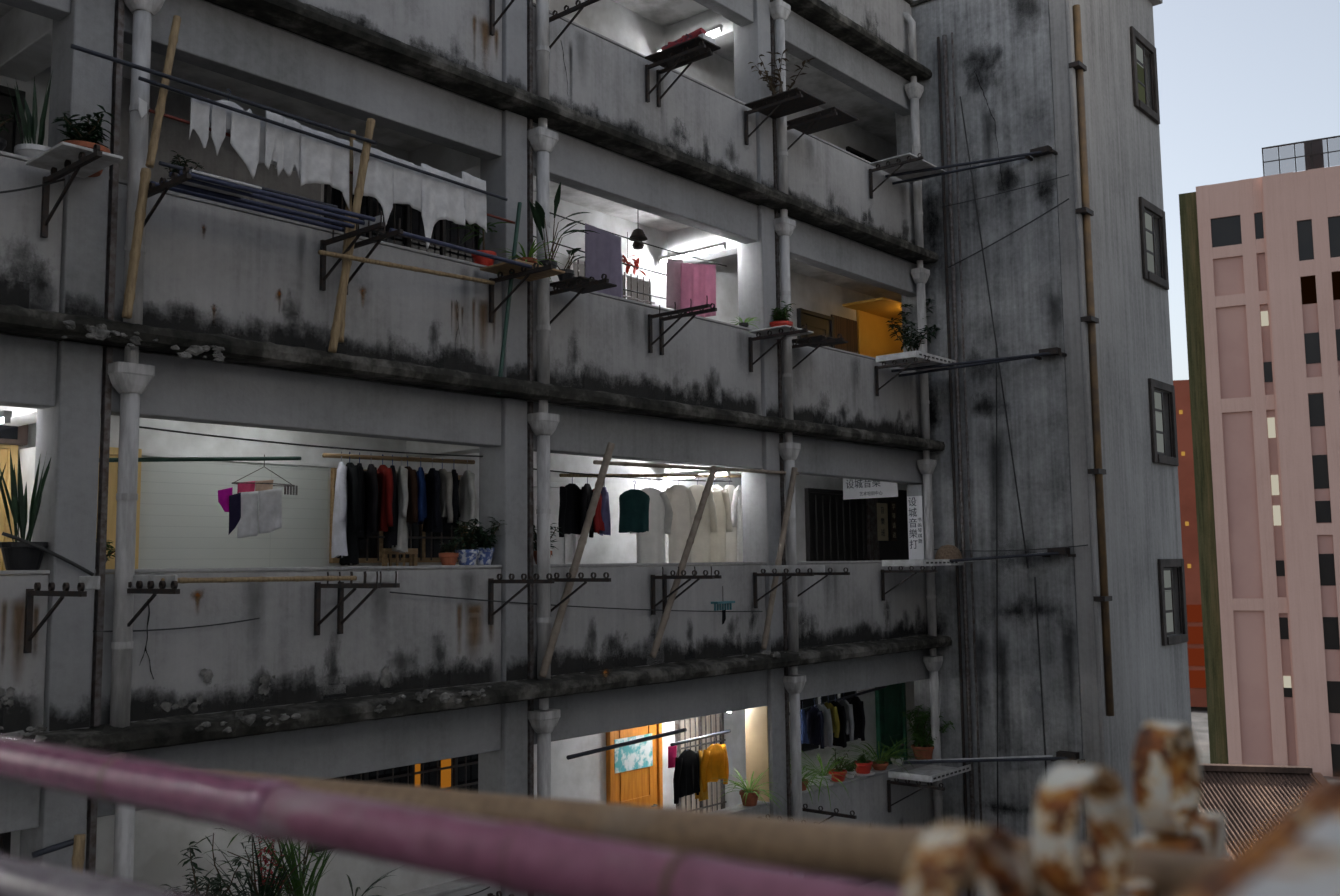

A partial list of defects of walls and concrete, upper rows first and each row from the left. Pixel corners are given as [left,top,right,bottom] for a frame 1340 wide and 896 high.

damp [967,50,1000,88]
damp [998,164,1018,192]
damp [923,192,940,270]
damp [929,390,938,432]
corrosion [1180,777,1340,896]